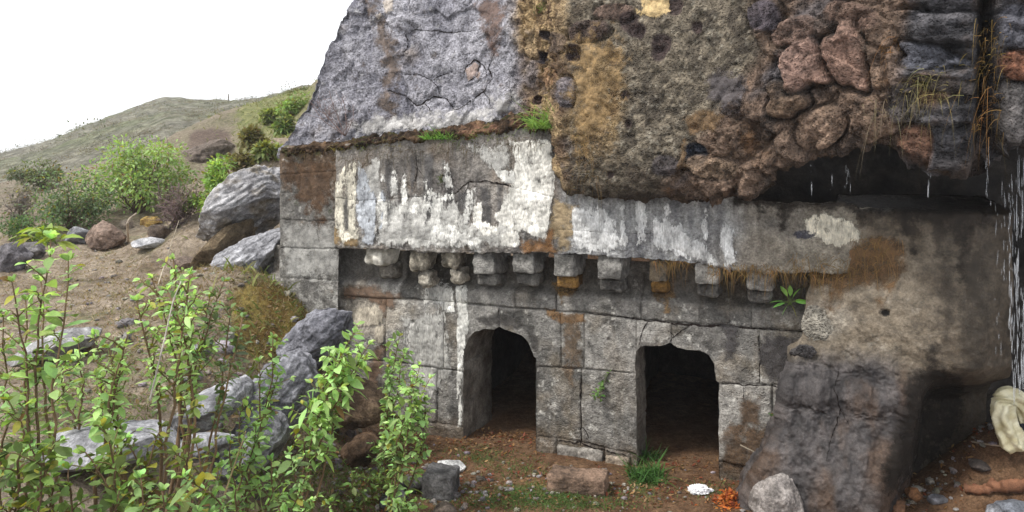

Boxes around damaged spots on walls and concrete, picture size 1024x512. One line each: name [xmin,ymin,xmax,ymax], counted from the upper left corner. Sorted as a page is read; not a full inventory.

crack [388,29,494,116]
flaking render [335,139,555,248]
crack [455,180,513,203]
crack [589,313,802,399]
crack [826,376,849,461]